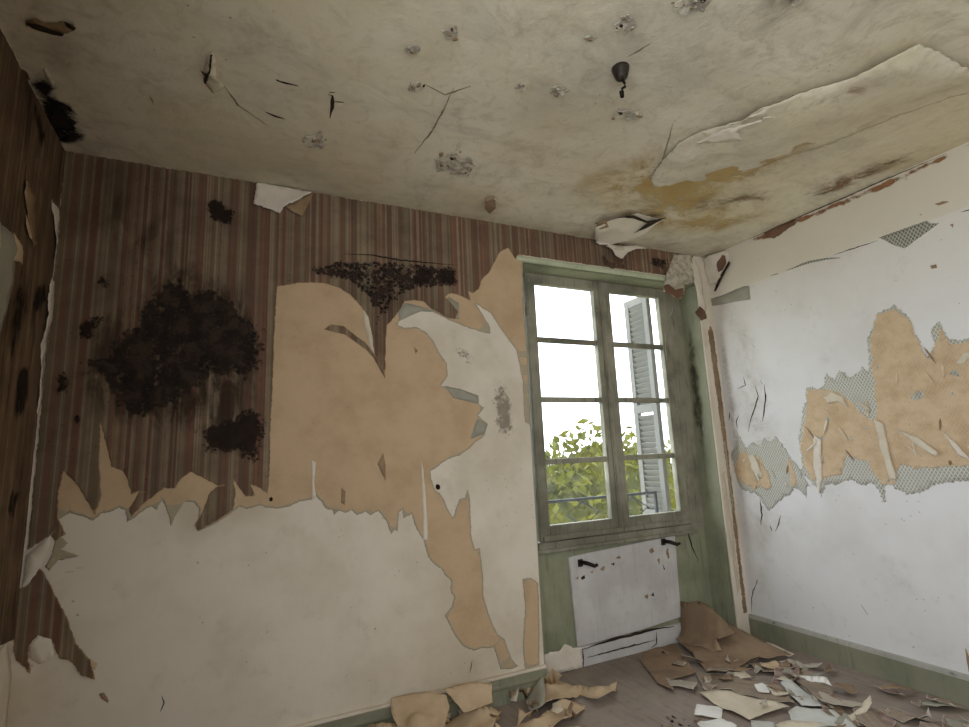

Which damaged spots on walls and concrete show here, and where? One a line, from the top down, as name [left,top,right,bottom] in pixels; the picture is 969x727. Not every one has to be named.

water stain [22,67,83,146]
crack [416,85,471,151]
water stain [613,158,773,229]
water stain [818,159,898,195]
flaking render [0,181,38,332]
water stain [312,260,457,324]
water stain [79,271,266,462]
peeling [708,304,969,613]
peeling [22,535,51,587]
peeling [29,635,54,664]